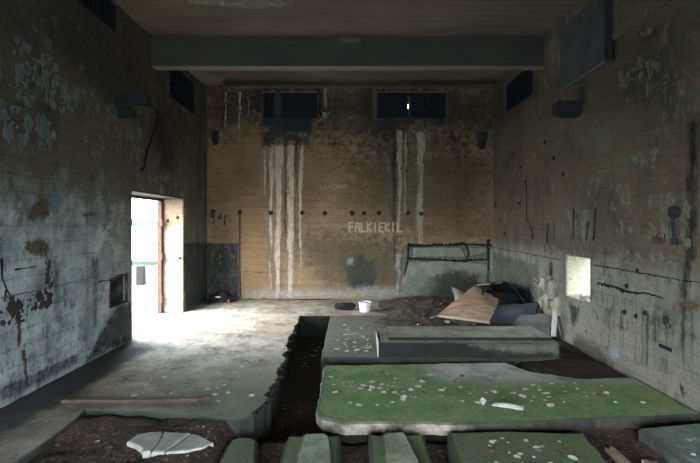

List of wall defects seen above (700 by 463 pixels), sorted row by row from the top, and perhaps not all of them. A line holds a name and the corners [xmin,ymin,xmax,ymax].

peeling [1,36,100,155]
damp [184,71,538,308]
damp [680,122,697,299]
spalling [0,259,53,327]
damp [1,303,132,399]